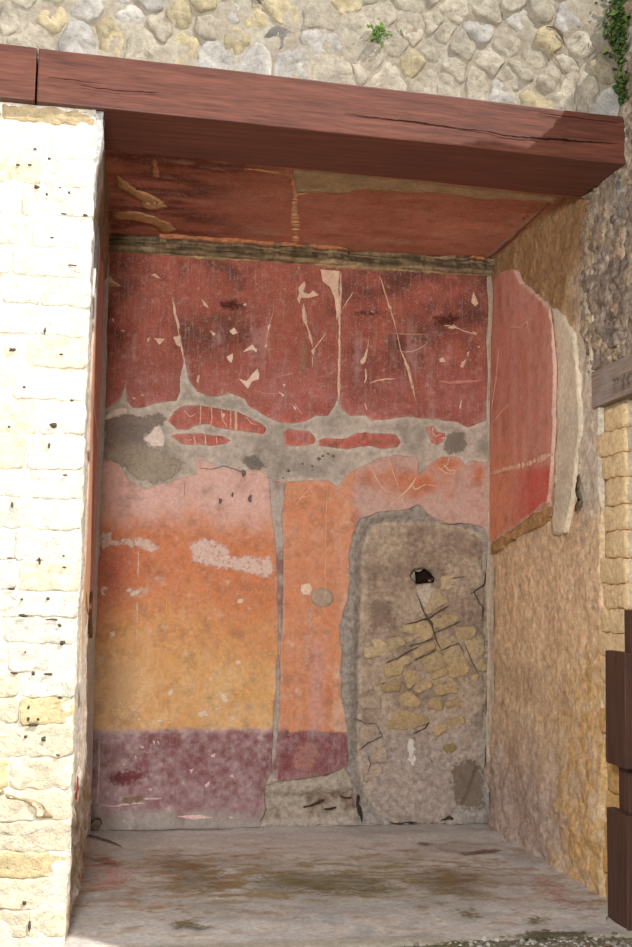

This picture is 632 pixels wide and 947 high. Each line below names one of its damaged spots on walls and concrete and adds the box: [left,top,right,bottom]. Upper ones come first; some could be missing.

flaking render [103,359,488,489]
flaking render [60,111,176,946]
flaking render [260,170,608,897]
crack [383,560,487,713]
crack [354,718,383,772]